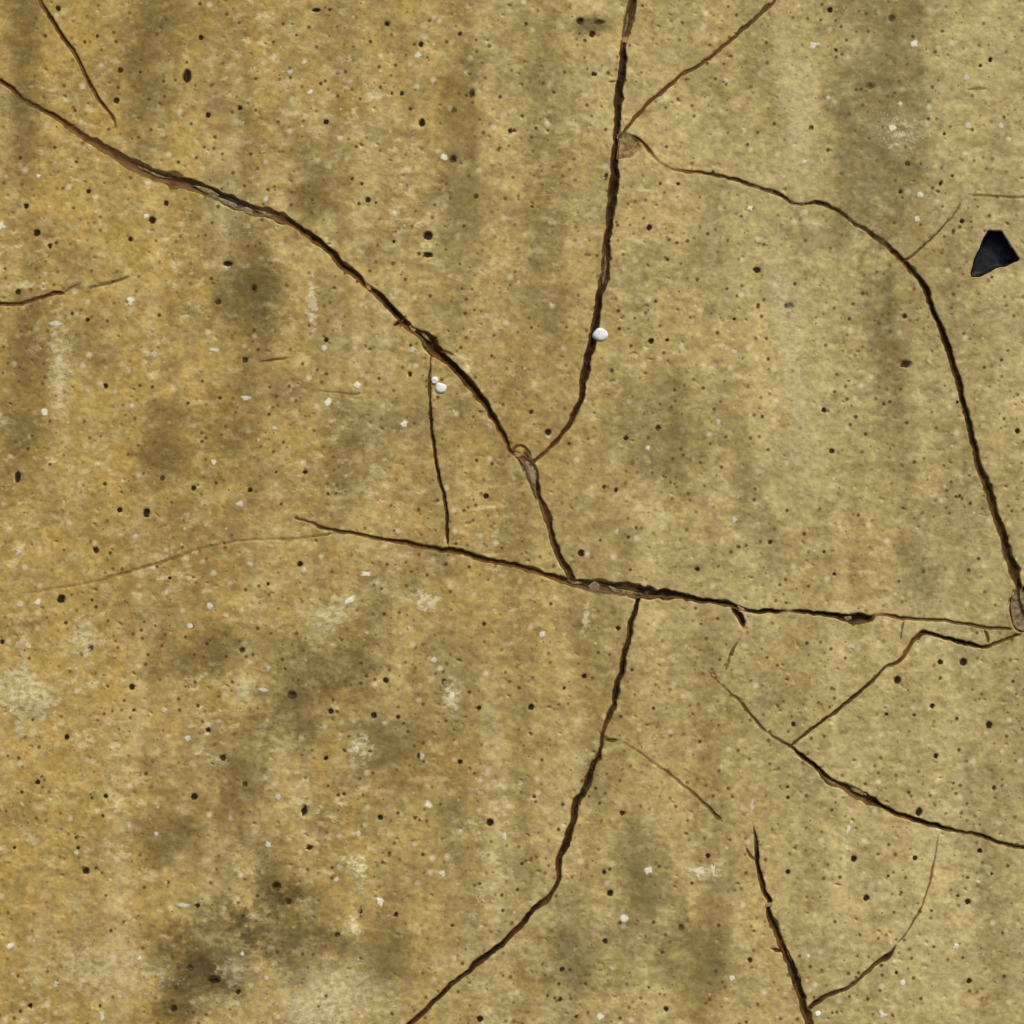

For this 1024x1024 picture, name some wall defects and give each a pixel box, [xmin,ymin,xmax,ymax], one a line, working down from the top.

crack [0,0,776,579]
crack [670,168,1022,589]
spalling [971,231,1019,276]
water stain [58,916,253,1021]
water stain [268,923,399,1024]
crack [295,518,1024,1024]